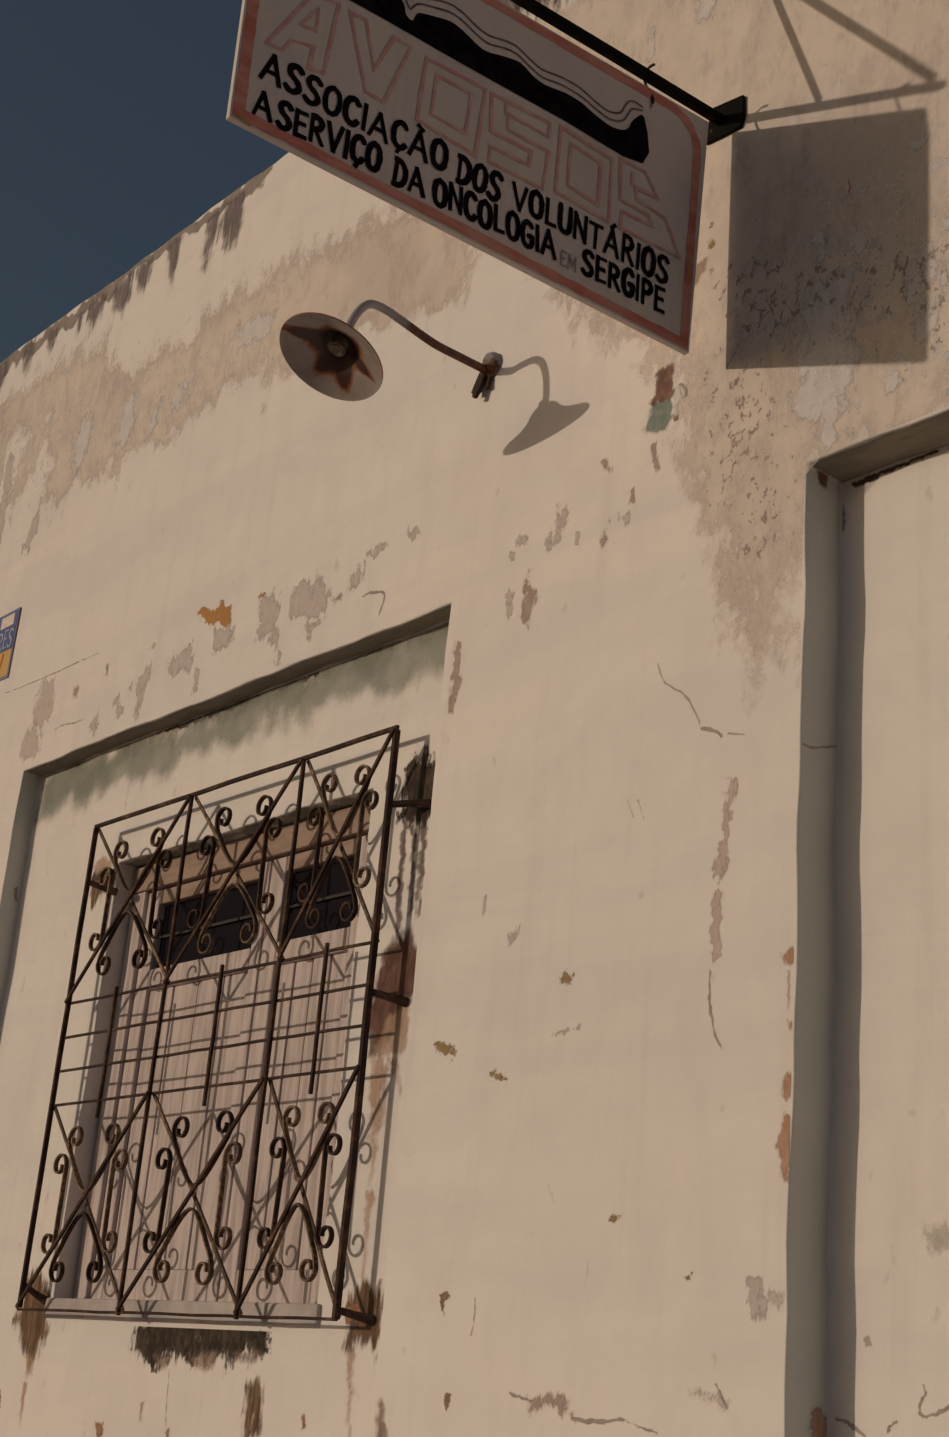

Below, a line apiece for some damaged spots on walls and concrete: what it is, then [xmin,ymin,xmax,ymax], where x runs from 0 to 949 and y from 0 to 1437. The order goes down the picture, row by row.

leakage [500,0,560,19]
peeling [0,206,475,508]
peeling [539,0,949,683]
leakage [811,411,949,487]
peeling [256,543,388,665]
crack [658,663,744,737]
corrosion [369,745,436,1155]
peeling [708,778,738,1047]
leakage [131,1326,272,1373]
corrosion [343,1281,383,1393]
crack [509,1392,657,1434]
crack [835,1384,949,1437]